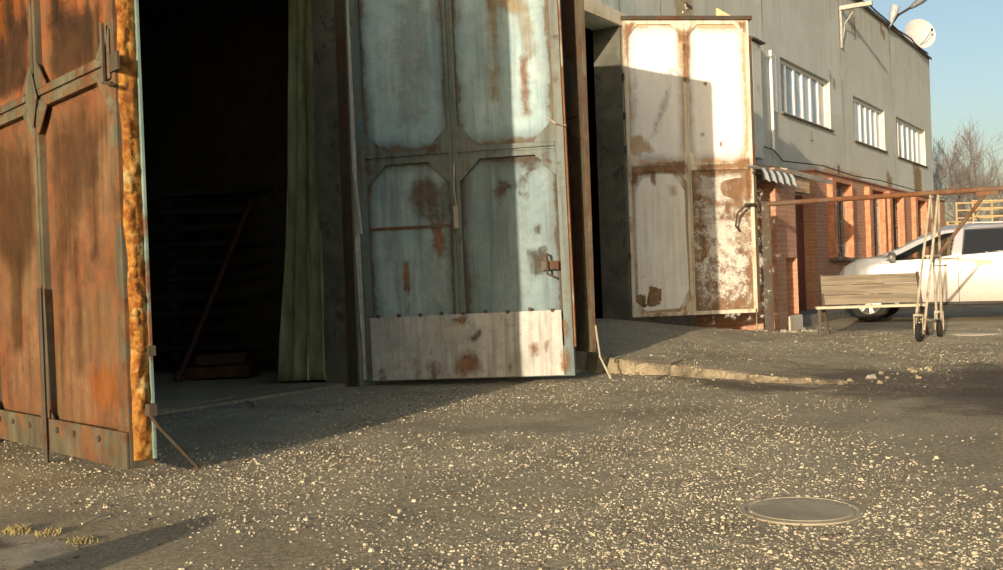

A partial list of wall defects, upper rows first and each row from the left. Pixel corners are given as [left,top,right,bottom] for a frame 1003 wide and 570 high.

rust [0,0,27,97]
rust [48,0,100,78]
rust [678,30,689,82]
rust [520,59,528,113]
rust [530,247,546,274]
rust [456,351,478,373]